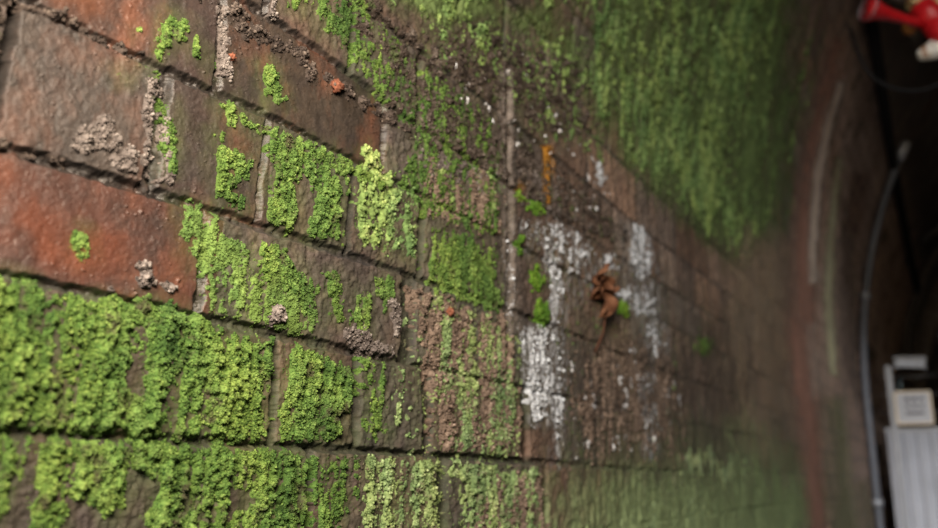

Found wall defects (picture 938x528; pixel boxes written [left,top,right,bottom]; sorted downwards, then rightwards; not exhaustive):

water stain [496,73,667,463]
water stain [595,39,869,528]